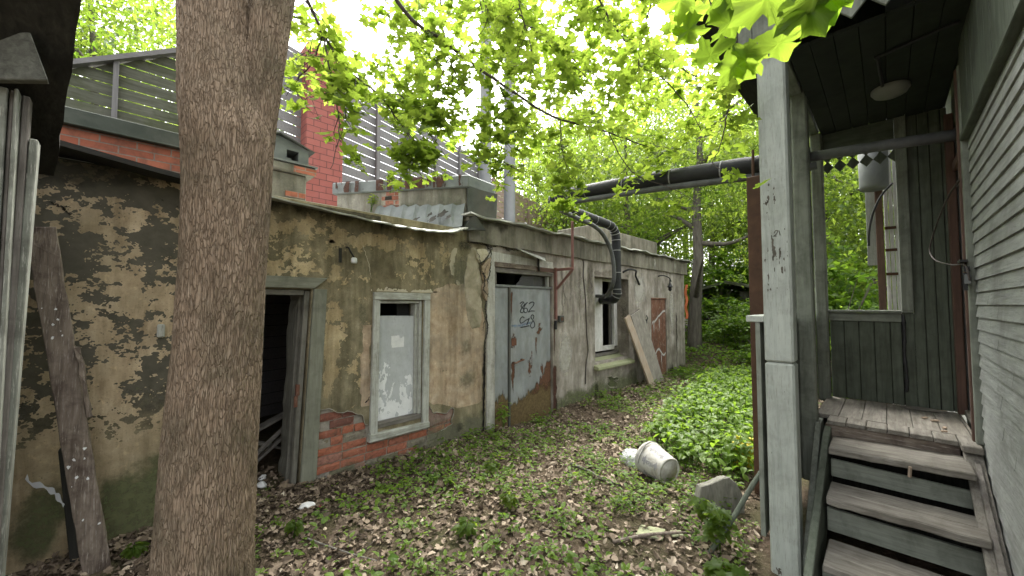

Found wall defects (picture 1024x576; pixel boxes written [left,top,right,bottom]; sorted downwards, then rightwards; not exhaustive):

peeling [5,176,180,575]
peeling [267,210,485,480]
crack [470,242,520,431]
corrosion [495,323,557,429]